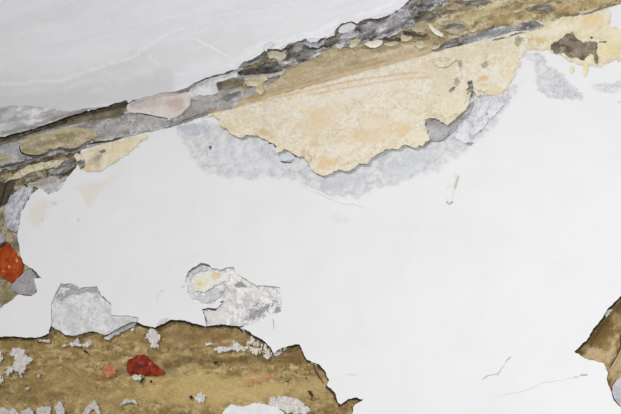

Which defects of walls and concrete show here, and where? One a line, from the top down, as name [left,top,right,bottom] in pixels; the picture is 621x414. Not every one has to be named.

peeling [0,0,621,308]
leakage [175,80,521,200]
flaking render [0,263,363,414]
flaking render [574,296,621,407]